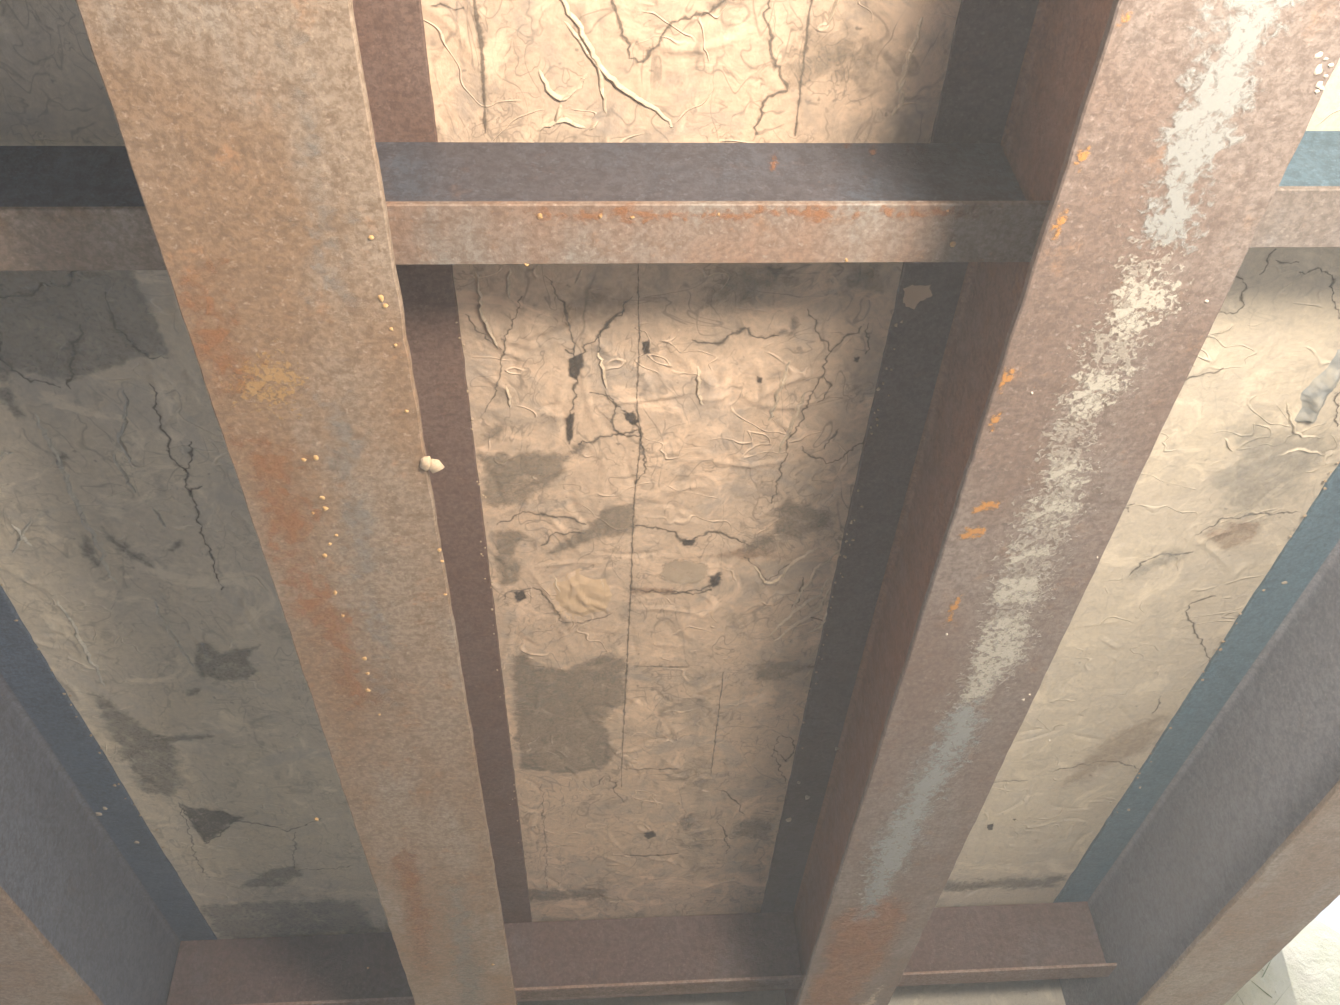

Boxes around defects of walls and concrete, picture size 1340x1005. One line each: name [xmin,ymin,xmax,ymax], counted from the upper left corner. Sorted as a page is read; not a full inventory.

crack [431,0,487,134]
crack [611,0,724,62]
crack [754,0,812,136]
spalling [903,285,932,309]
crack [1219,249,1340,319]
crack [0,292,223,590]
crack [771,309,870,504]
rust [999,367,1015,390]
crack [466,265,822,802]
rust [961,501,1000,540]
crack [1128,511,1297,577]
damp [513,656,625,773]